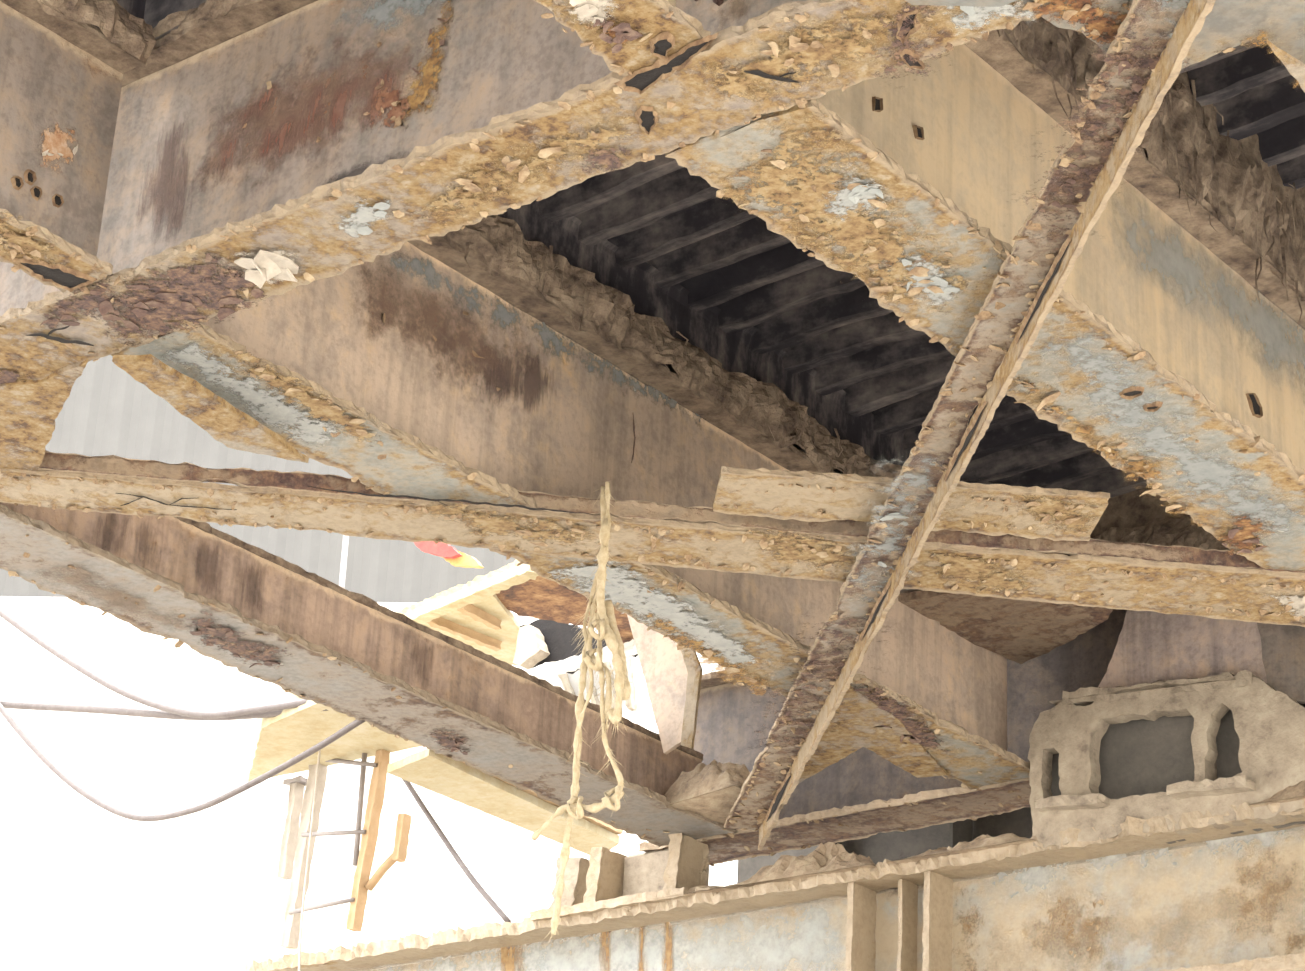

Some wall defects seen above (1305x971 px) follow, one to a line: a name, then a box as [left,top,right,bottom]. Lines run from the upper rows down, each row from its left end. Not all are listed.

peeling [10,123,78,208]
corrosion [421,117,632,230]
corrosion [703,0,989,309]
corrosion [0,212,55,273]
corrosion [869,0,1170,524]
corrosion [41,219,309,463]
corrosion [358,259,547,408]
corrosion [51,565,305,697]
corrosion [351,477,953,858]
corrosion [929,552,1035,597]
corrosion [962,495,1098,534]
corrosion [663,922,673,971]